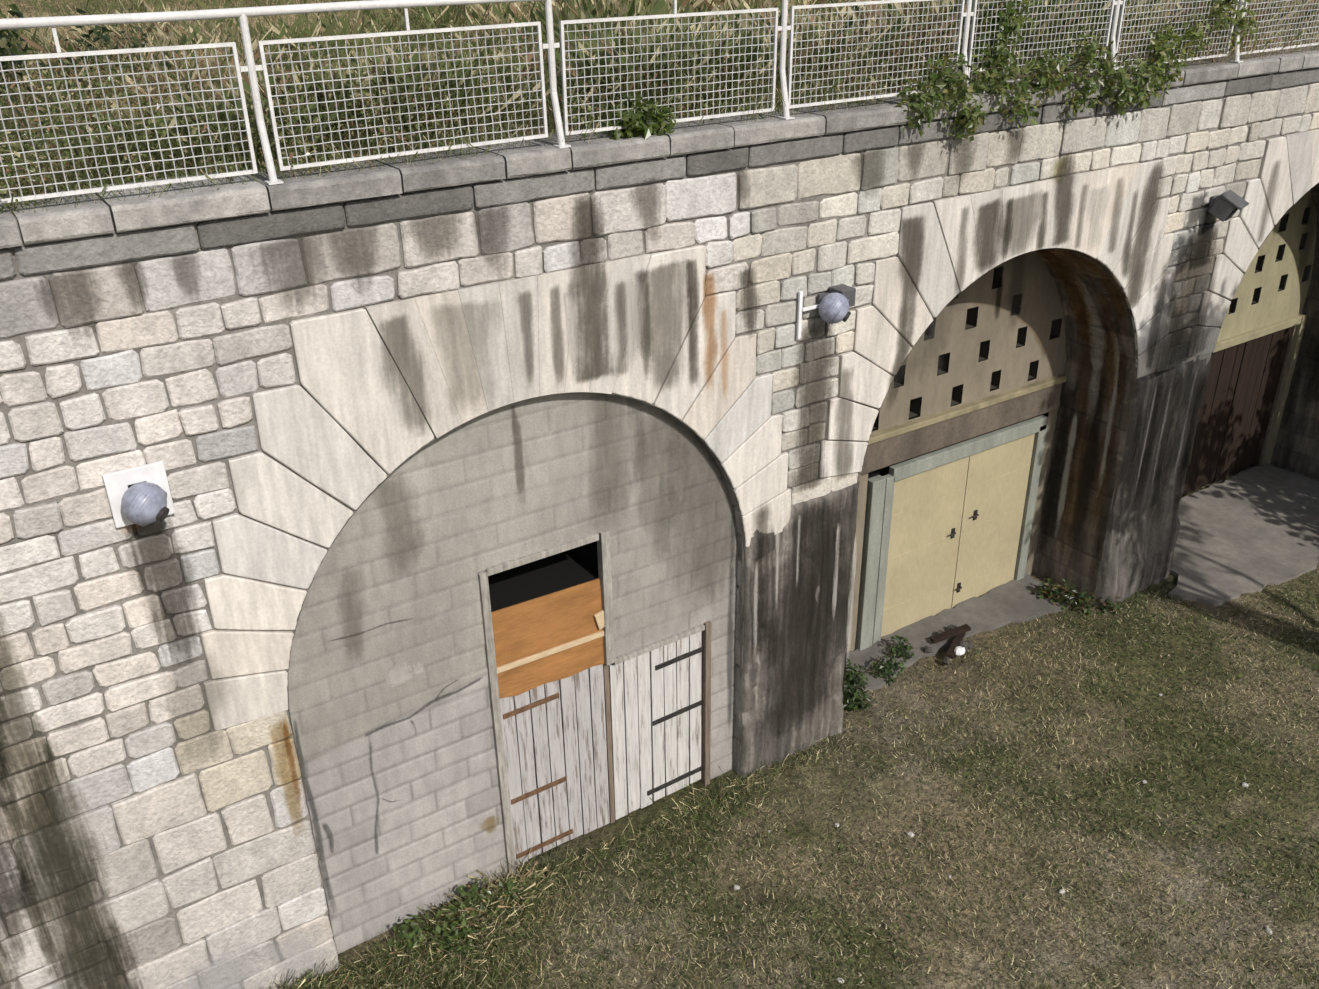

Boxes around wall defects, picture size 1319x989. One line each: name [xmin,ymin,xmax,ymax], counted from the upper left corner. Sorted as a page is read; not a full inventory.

leakage [577,200,608,379]
leakage [688,263,697,375]
leakage [890,218,923,401]
leakage [979,200,1013,266]
leakage [1039,155,1074,248]
leakage [1125,168,1161,303]
leakage [757,509,843,724]